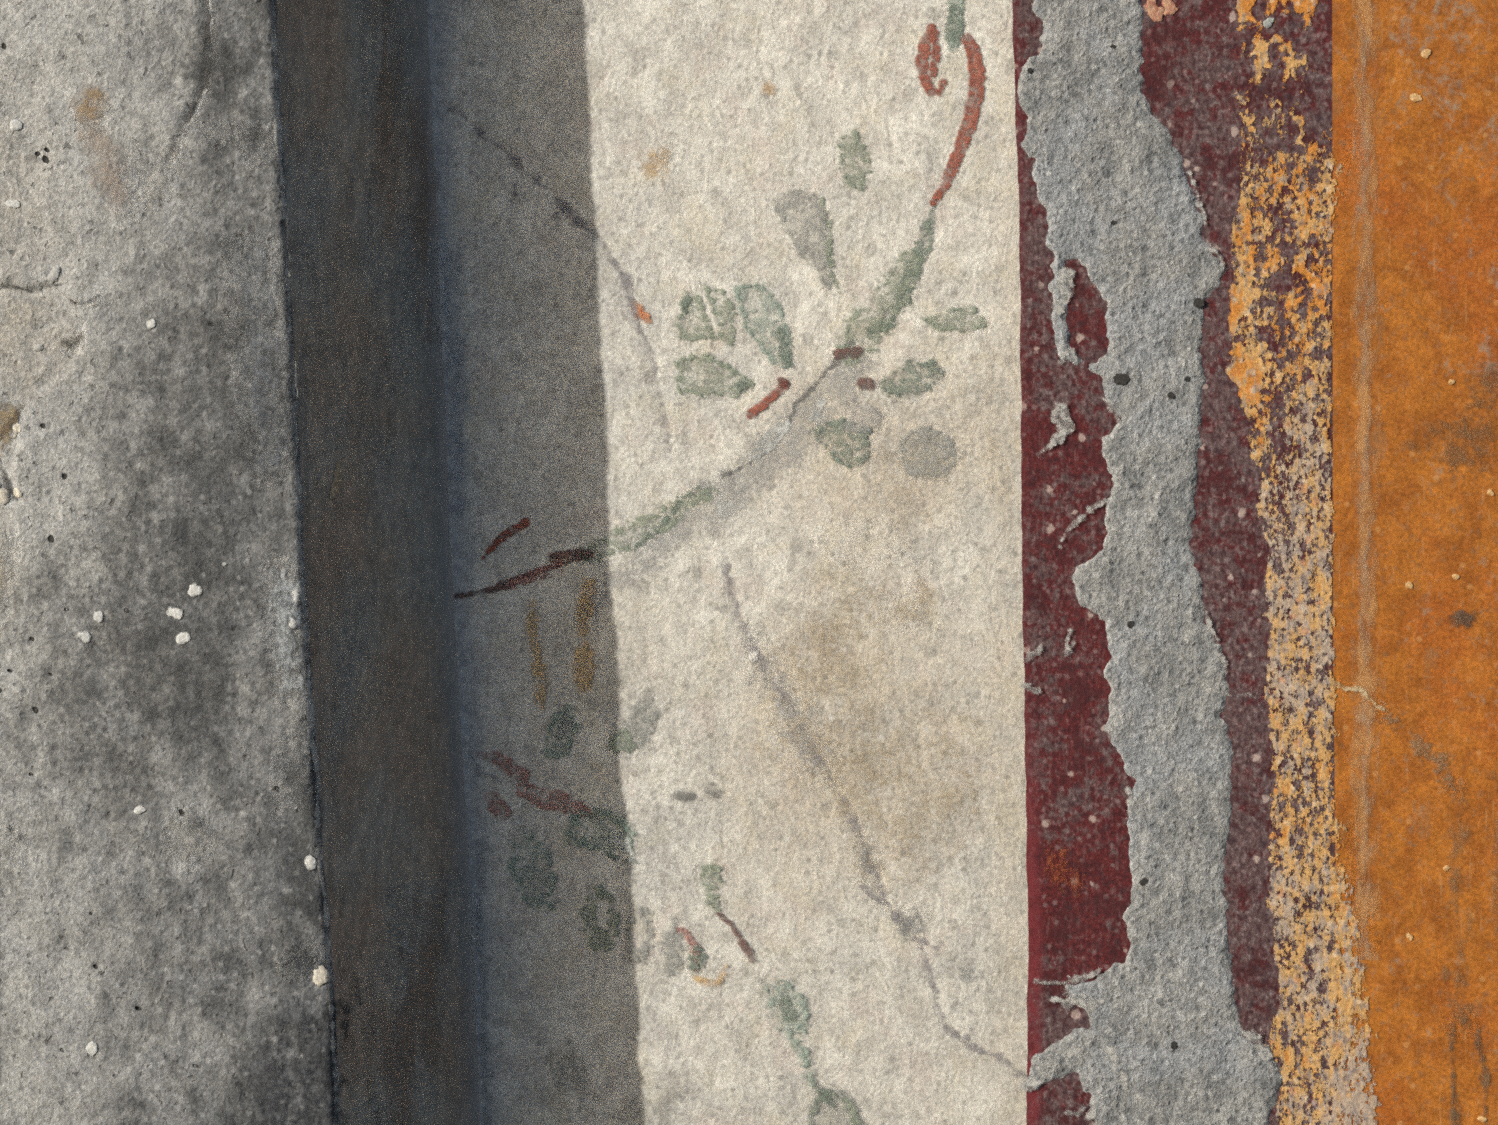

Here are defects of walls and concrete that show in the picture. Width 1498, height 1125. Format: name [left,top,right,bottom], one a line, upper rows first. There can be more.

crack [165,0,214,168]
crack [449,108,656,375]
crack [3,284,98,346]
crack [0,462,17,500]
efflorescence [269,569,304,689]
crack [723,563,791,706]
spalling [1017,0,1382,1125]
crack [809,741,1023,1075]
damp [223,1000,349,1125]